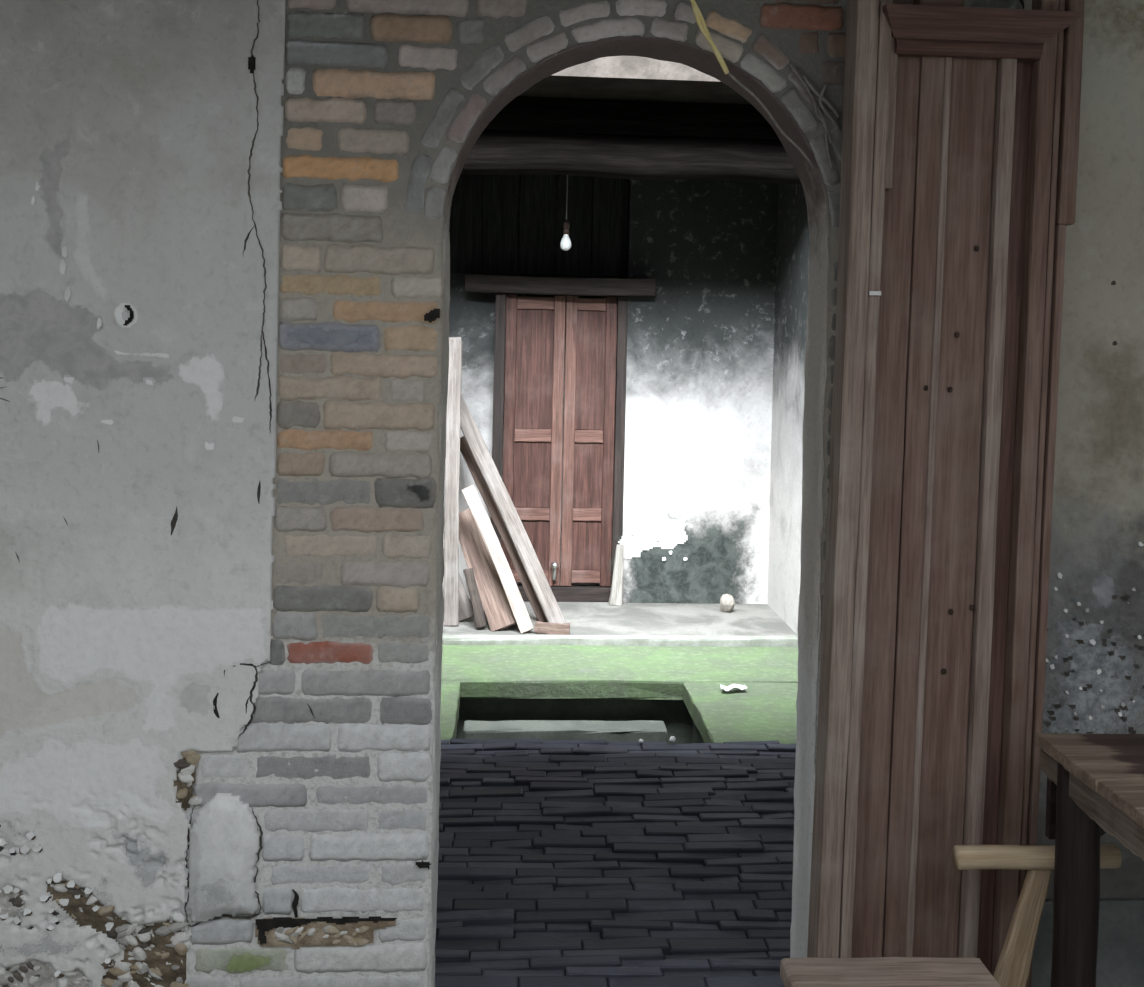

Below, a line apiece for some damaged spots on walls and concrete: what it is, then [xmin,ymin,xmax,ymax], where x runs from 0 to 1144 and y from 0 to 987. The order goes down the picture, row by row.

crack [243,0,272,433]
peeling [178,680,214,723]
crack [213,662,270,738]
flaking render [173,751,202,811]
peeling [0,825,42,855]
flaking render [0,873,192,987]
spalling [255,916,397,949]